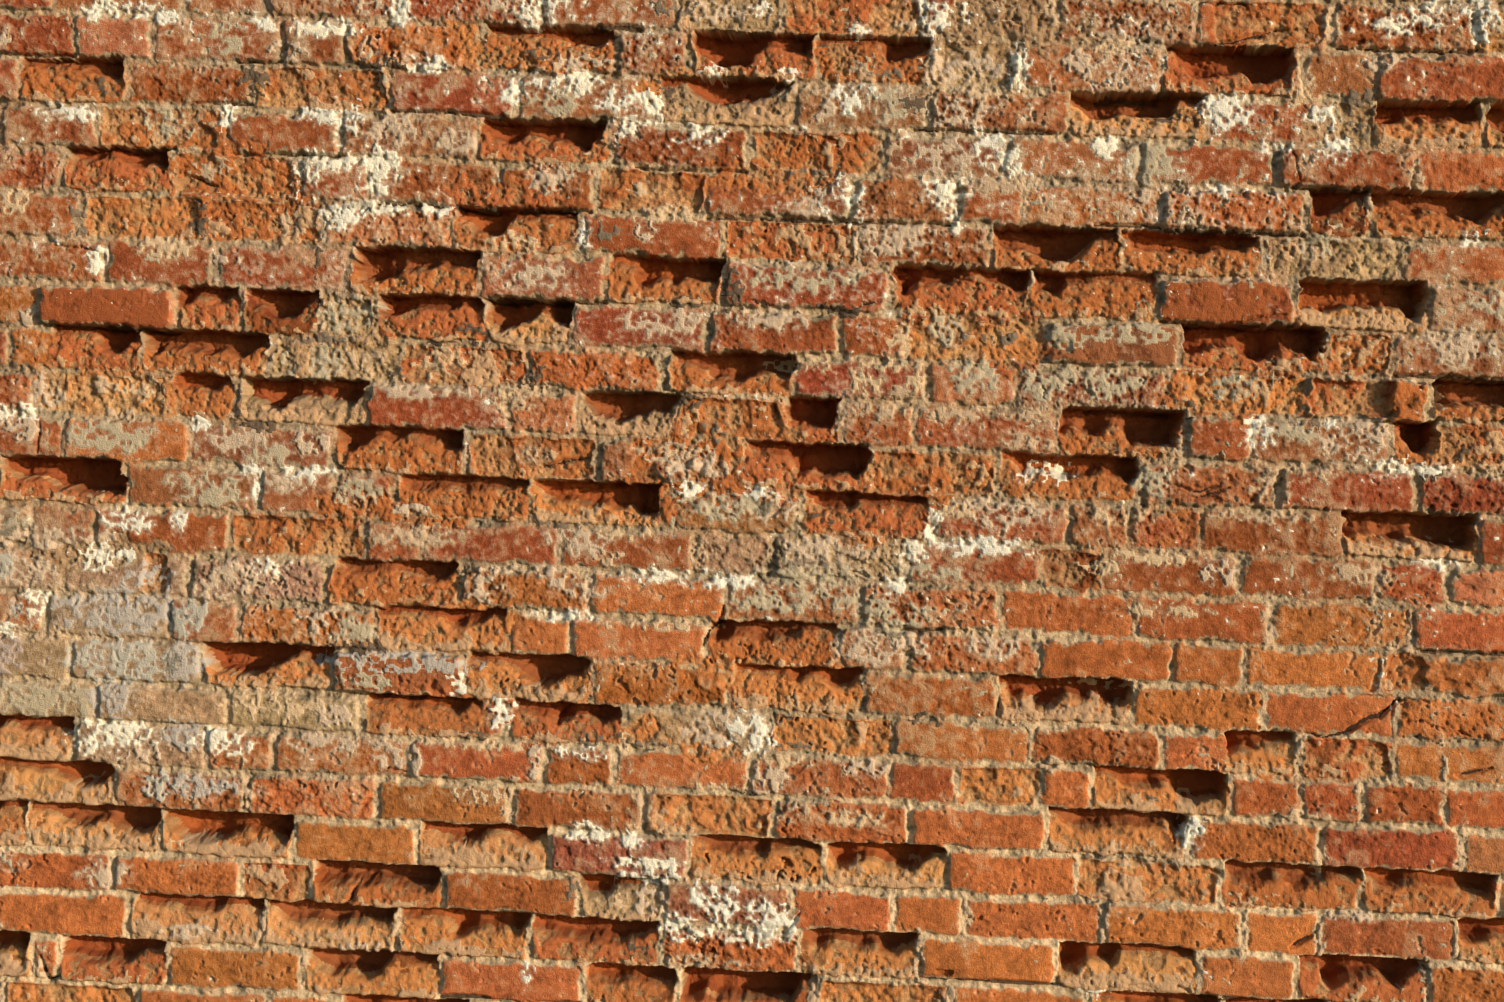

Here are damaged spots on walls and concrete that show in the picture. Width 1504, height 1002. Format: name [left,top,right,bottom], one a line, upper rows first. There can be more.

leakage [341,18,424,83]
leakage [612,0,699,112]
leakage [1322,7,1342,41]
spalling [680,0,1105,294]
spalling [0,281,570,455]
peeling [612,289,809,345]
leakage [1203,255,1258,320]
leakage [1263,207,1332,260]
leakage [1385,260,1463,381]
peeling [0,383,1051,852]
spalling [0,818,432,940]
spalling [536,874,668,939]